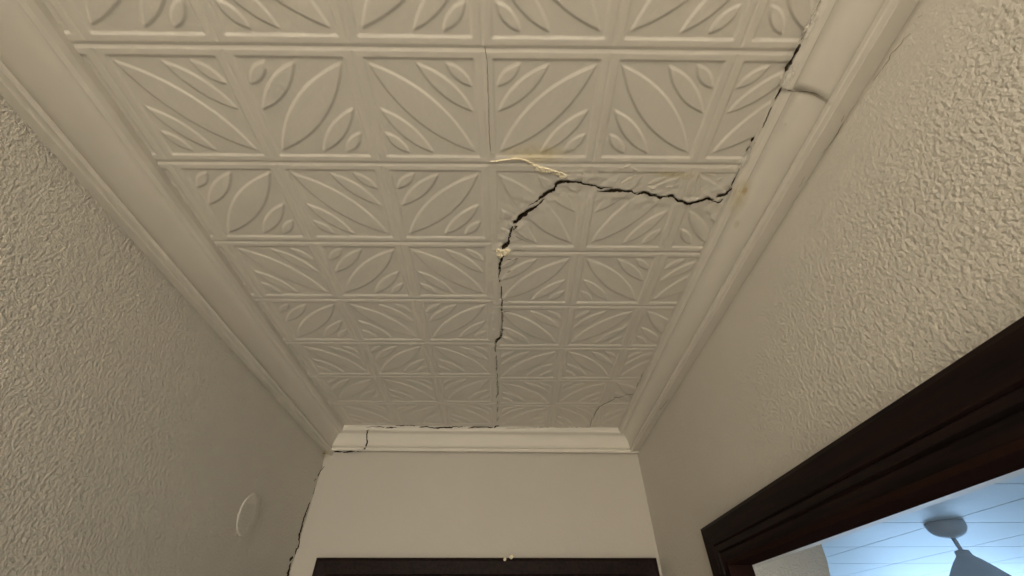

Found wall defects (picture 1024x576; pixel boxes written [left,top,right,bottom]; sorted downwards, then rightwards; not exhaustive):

crack [287,0,821,576]